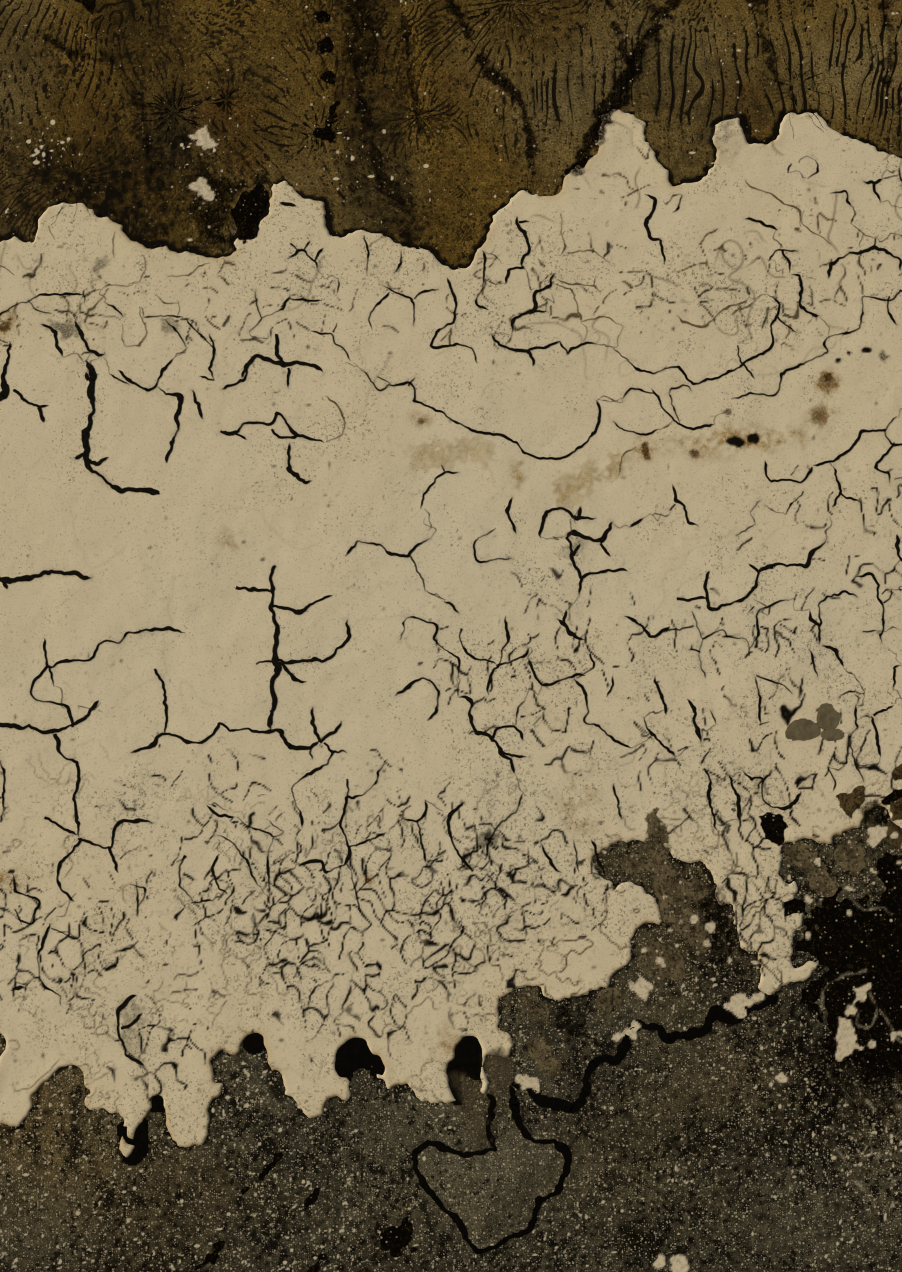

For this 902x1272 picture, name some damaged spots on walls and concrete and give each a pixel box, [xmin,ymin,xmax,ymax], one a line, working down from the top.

leakage [75,0,98,29]
leakage [191,163,269,244]
leakage [313,0,404,204]
peeling [0,0,902,270]
crack [0,37,902,495]
leakage [447,0,537,182]
leakage [566,0,680,175]
leakage [746,0,783,85]
crack [0,416,902,1140]
peeling [893,764,902,781]
peeling [0,786,902,1272]
leakage [784,852,902,1084]